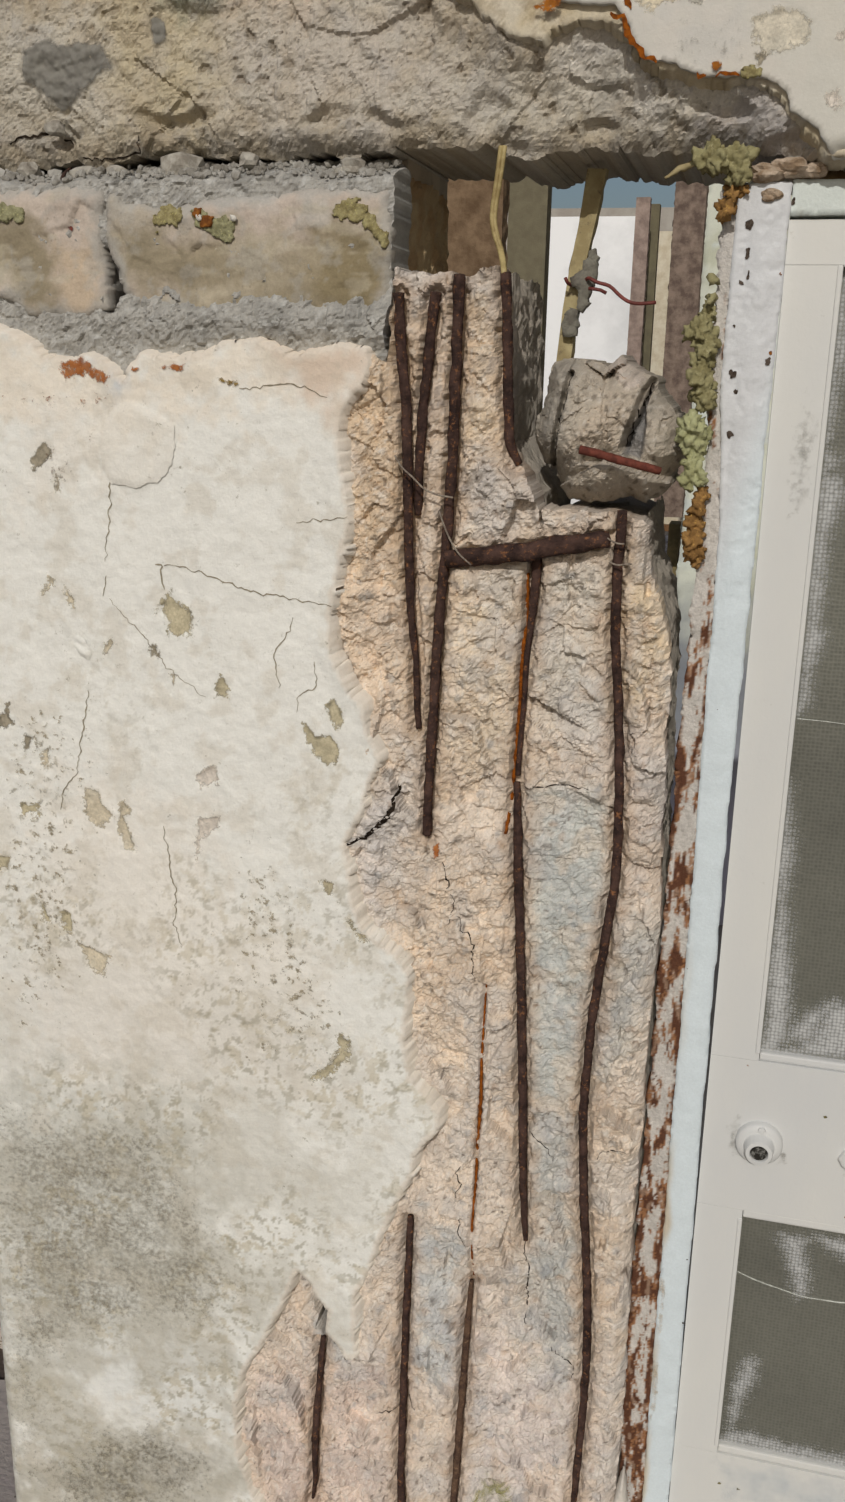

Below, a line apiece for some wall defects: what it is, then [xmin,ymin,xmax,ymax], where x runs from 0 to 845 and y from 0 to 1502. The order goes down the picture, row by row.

spalling [0,0,818,413]
corrosion [61,356,110,407]
peeling [30,443,63,491]
peeling [148,593,194,657]
peeling [214,674,231,699]
peeling [0,702,50,767]
peeling [20,802,42,816]
peeling [82,787,135,850]
crack [346,784,401,846]
corrosion [619,187,737,1502]
spalling [241,265,686,1502]
peeling [40,904,112,977]